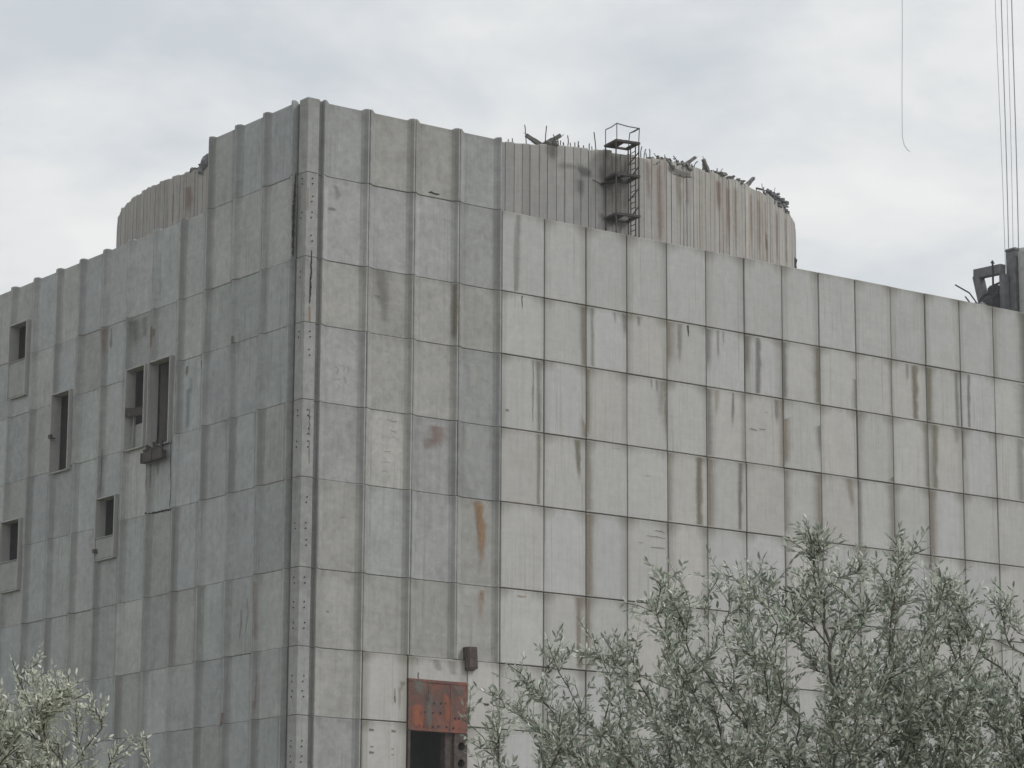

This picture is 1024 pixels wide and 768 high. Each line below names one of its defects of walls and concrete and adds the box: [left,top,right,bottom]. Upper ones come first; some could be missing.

crack [292,173,312,321]
leakage [745,336,761,393]
leakage [576,307,591,668]
leakage [697,389,711,525]
leakage [913,365,937,554]